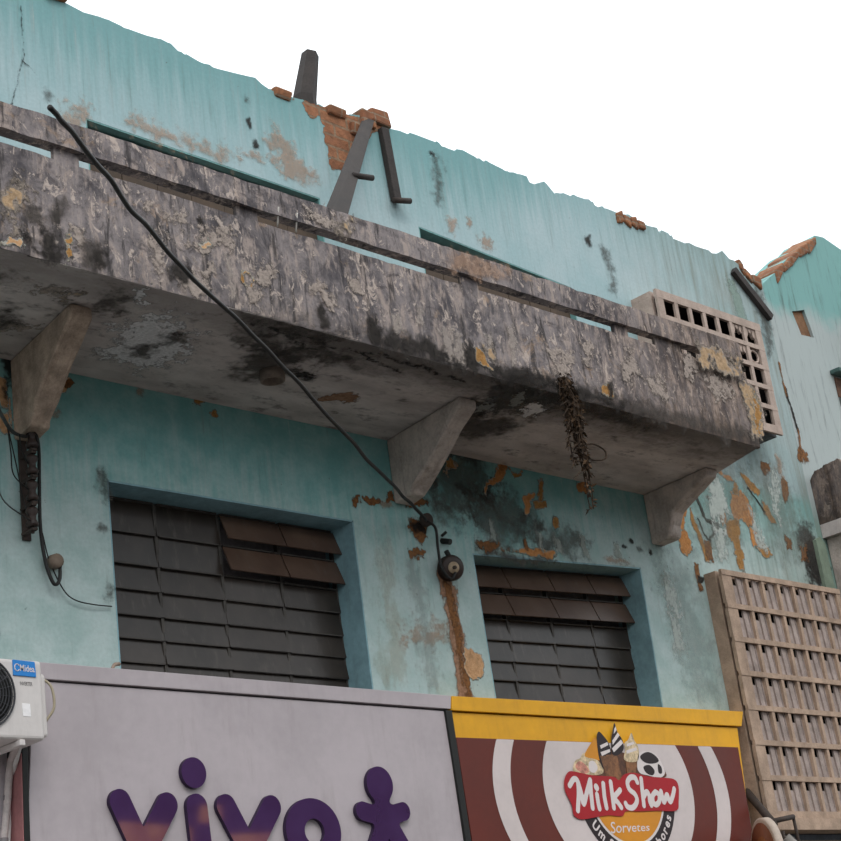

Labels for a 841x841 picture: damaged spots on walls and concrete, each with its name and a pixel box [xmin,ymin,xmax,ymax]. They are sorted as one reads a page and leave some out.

flaking render [271,86,392,170]
water stain [20,196,66,267]
water stain [83,241,108,272]
flaking render [735,237,816,290]
water stain [367,315,479,374]
water stain [460,328,565,439]
flaking render [405,498,429,561]
water stain [429,454,590,559]
peeling [678,507,710,563]
peeling [718,470,777,573]
peeling [780,476,789,503]
rust [437,571,473,697]